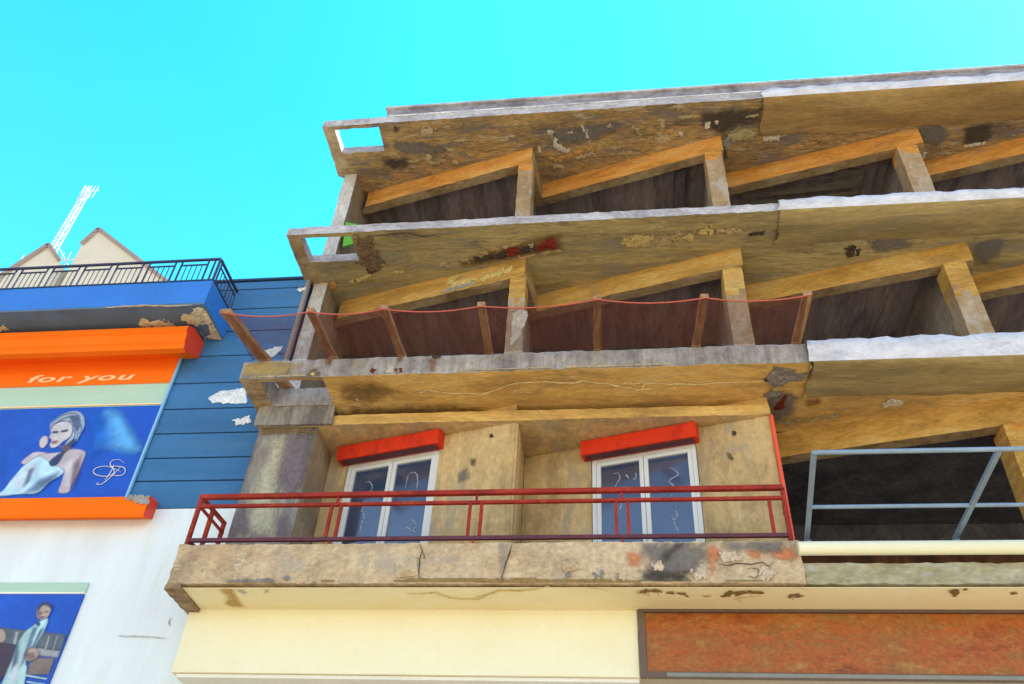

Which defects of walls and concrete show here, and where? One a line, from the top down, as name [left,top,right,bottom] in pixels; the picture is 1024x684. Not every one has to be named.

water stain [384,127,448,167]
water stain [535,122,619,153]
water stain [919,125,947,145]
water stain [965,123,991,144]
spalling [319,233,404,290]
spalling [438,235,562,293]
peeling [107,304,222,340]
peeling [209,388,247,404]
crack [420,380,759,396]
peeling [232,415,251,425]
crack [407,543,549,600]
water stain [393,543,704,582]